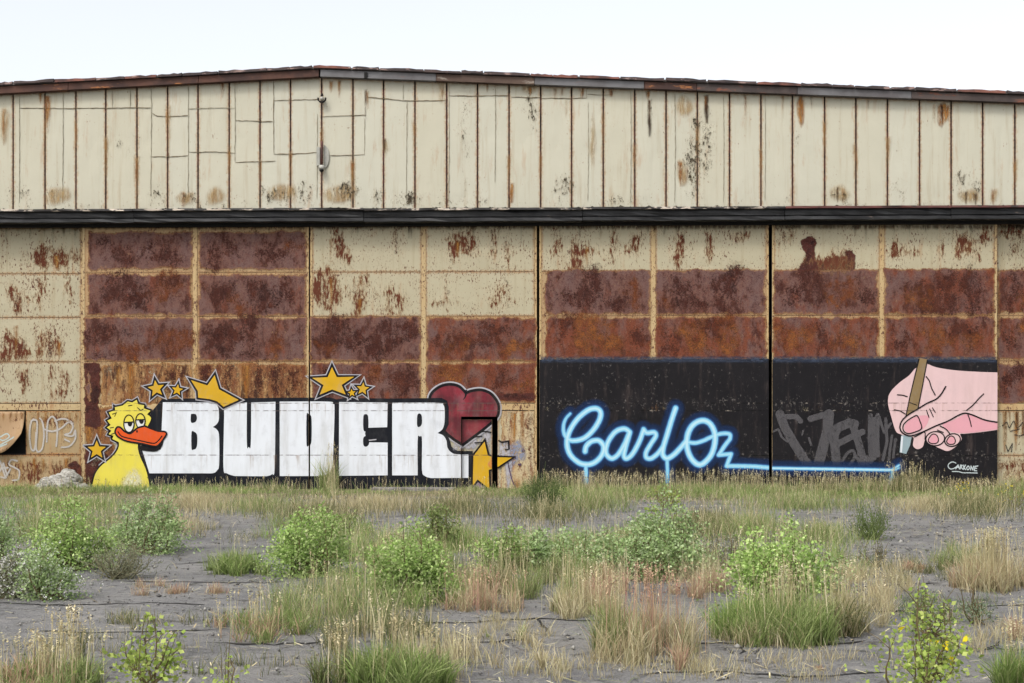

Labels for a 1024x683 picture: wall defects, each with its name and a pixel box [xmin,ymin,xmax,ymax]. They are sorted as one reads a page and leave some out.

mould [683,106,712,196]
corrosion [938,104,949,125]
corrosion [0,224,1024,488]